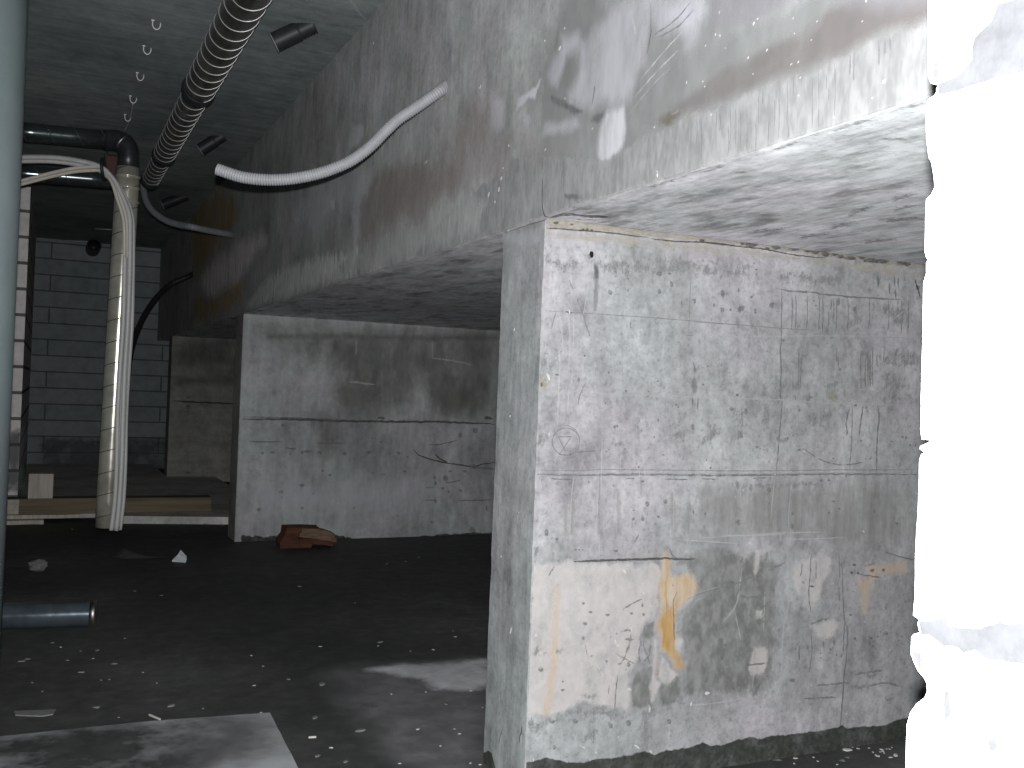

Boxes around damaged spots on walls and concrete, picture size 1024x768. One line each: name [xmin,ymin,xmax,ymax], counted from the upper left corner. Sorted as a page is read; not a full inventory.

crack [178,396,495,501]
corrosion [657,554,696,669]
water stain [526,474,915,768]